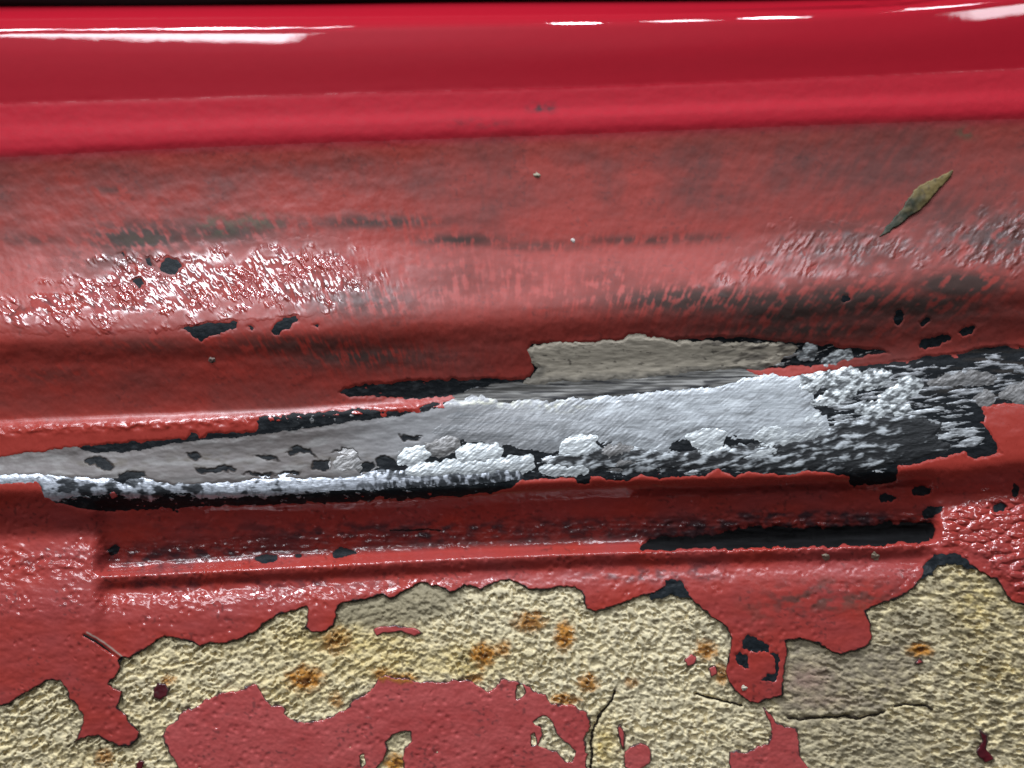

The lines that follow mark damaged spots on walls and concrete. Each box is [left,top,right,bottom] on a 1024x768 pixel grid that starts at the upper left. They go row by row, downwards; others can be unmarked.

peeling [145,257,182,275]
peeling [182,321,254,342]
peeling [522,334,798,385]
peeling [640,486,942,551]
rust [326,633,345,647]
rust [469,643,507,681]
peeling [0,553,1024,768]
rust [554,623,574,648]
rust [696,644,716,658]
crack [695,693,743,706]
crack [787,703,933,721]
crack [589,690,616,768]